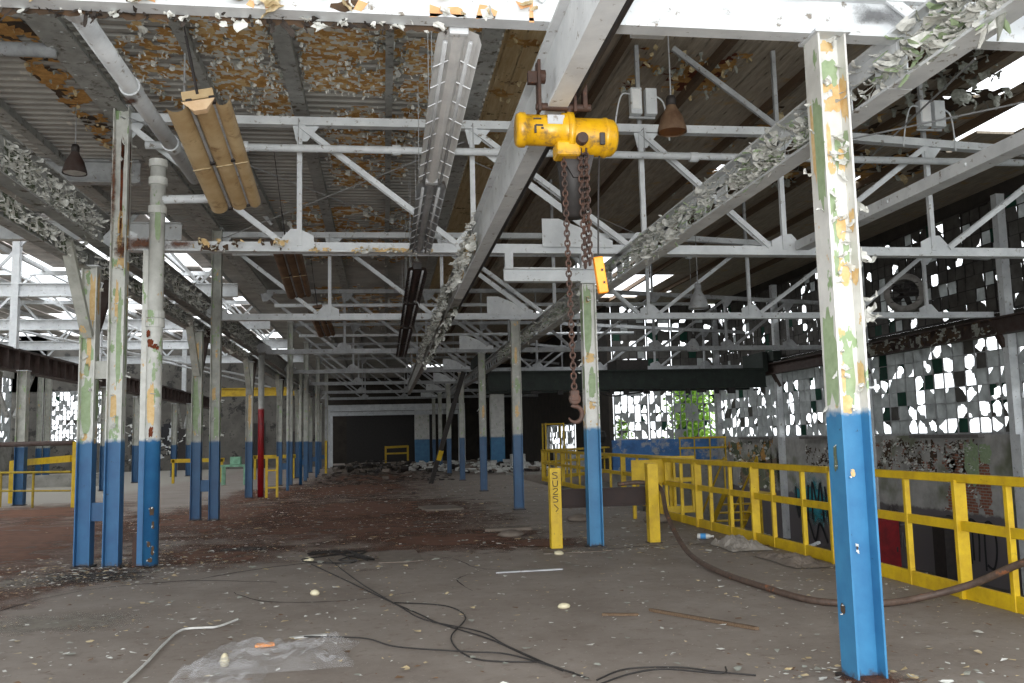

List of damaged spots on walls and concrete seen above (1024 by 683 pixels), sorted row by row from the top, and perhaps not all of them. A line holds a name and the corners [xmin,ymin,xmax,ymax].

peeling [0,0,498,190]
peeling [0,57,143,461]
rust [146,330,159,351]
peeling [495,0,1016,414]
peeling [876,438,994,516]